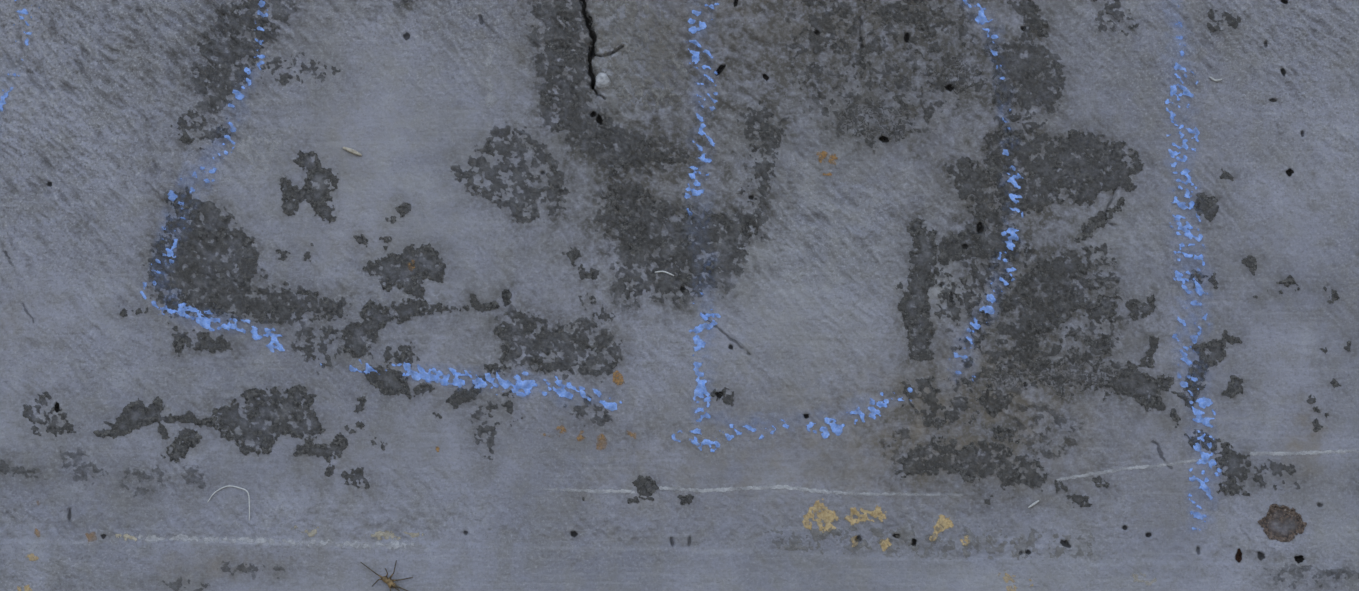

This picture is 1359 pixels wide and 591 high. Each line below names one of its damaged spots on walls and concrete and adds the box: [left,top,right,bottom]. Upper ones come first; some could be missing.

leakage [22,0,786,489]
crack [581,0,597,90]
leakage [789,0,1300,508]
corrosion [1257,504,1307,542]